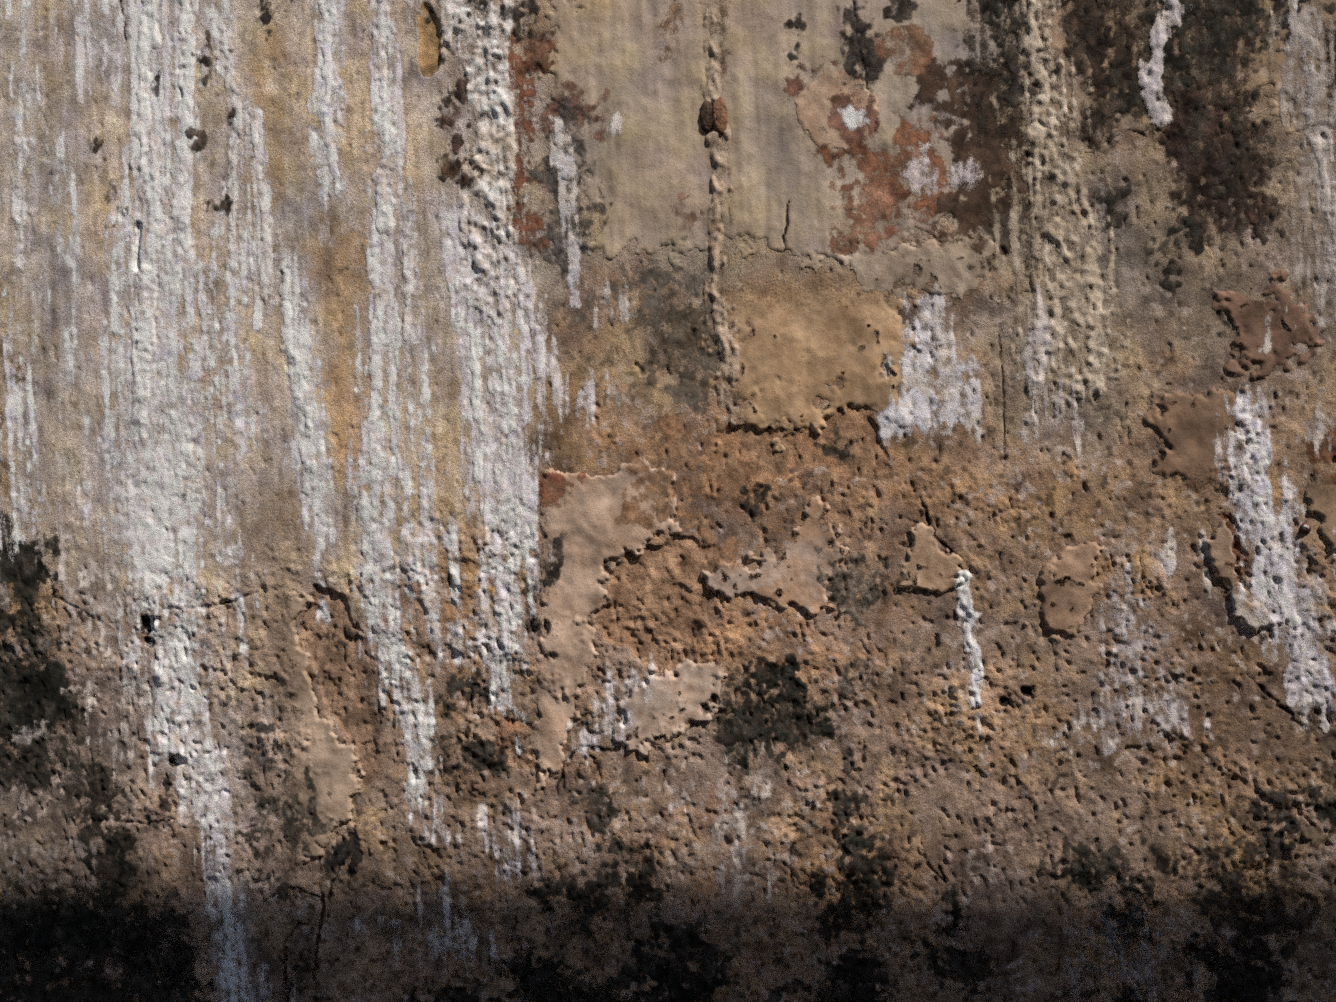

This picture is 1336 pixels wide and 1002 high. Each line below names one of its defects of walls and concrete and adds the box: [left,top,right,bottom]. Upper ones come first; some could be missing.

rust [493,23,610,257]
rust [784,57,846,96]
rust [814,91,951,255]
rust [868,22,934,76]
water stain [900,0,1336,458]
water stain [0,0,995,1002]
flaking render [495,459,850,792]
water stain [1039,385,1336,1002]
crack [262,856,343,1002]